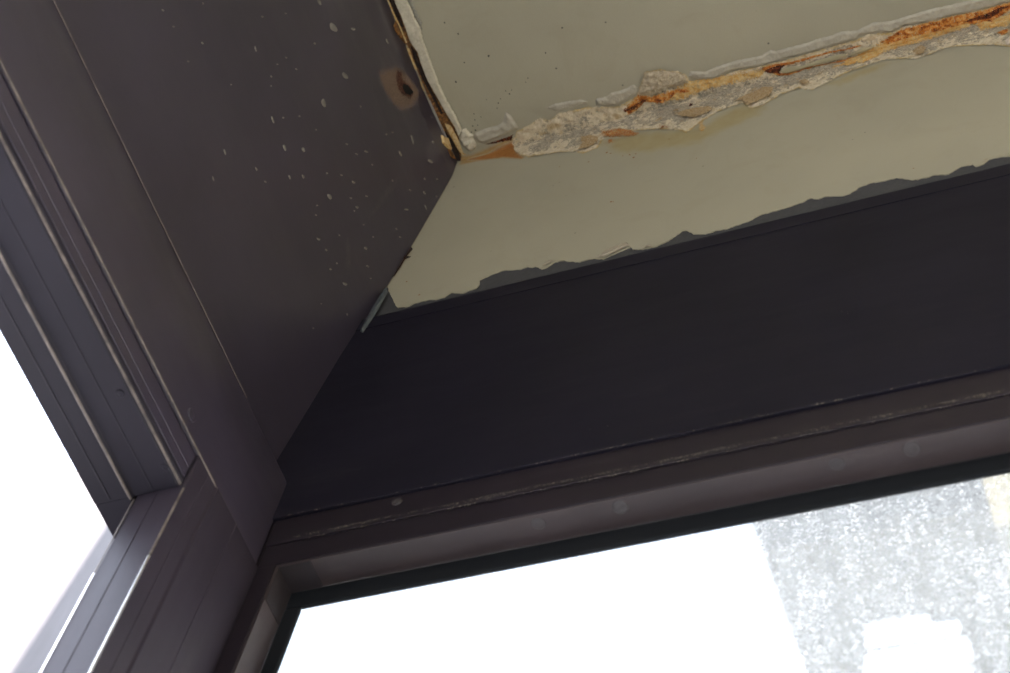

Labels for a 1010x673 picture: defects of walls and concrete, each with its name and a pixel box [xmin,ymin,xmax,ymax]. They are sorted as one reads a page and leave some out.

rust [374,0,525,167]
rust [600,128,639,158]
spalling [395,0,1010,158]
rust [624,3,1010,115]